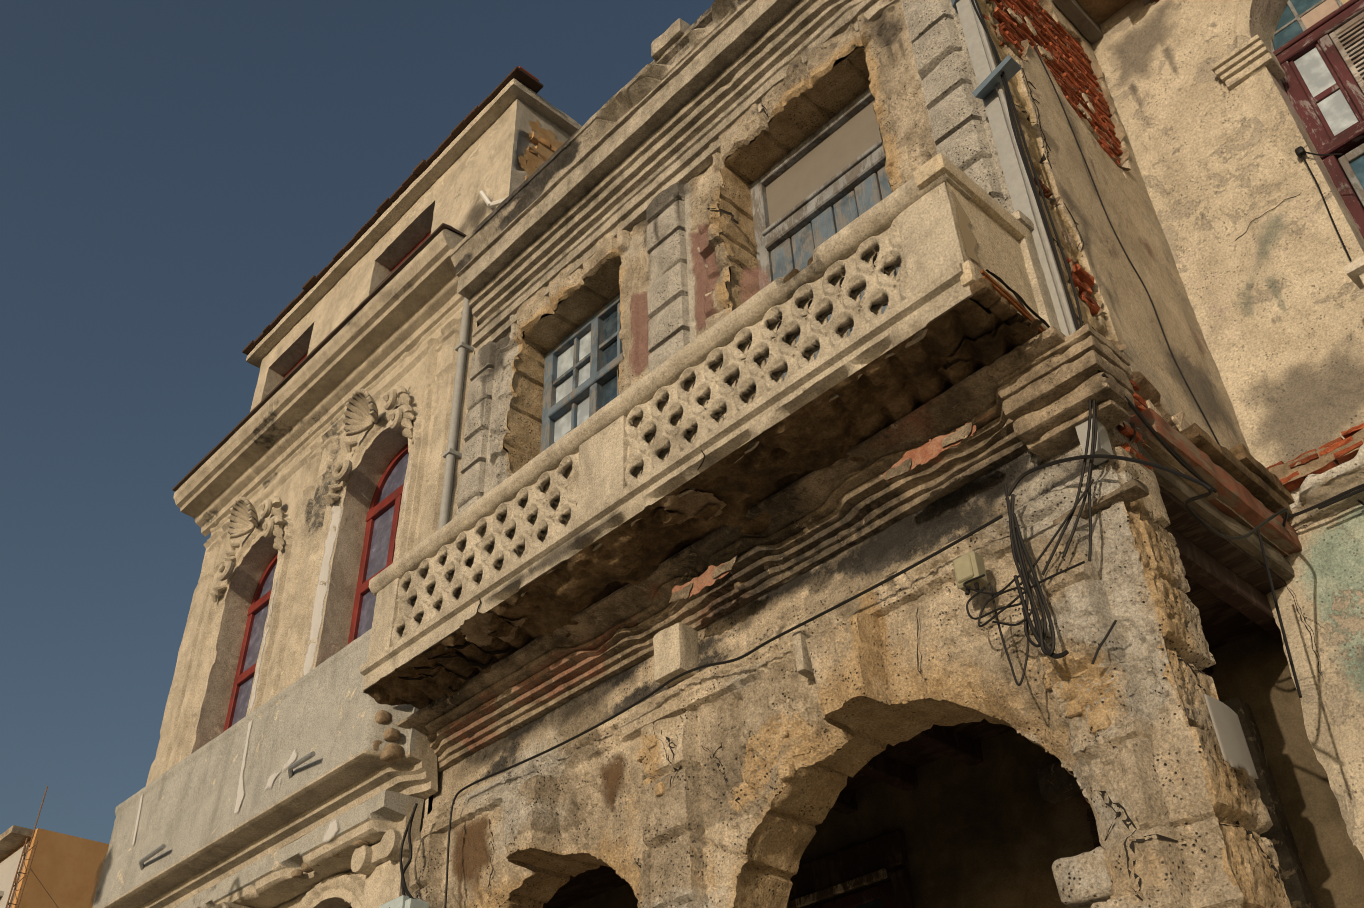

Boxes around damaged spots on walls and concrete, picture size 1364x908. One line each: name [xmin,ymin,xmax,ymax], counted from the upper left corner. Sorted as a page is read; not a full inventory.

flaking render [983,0,1131,182]
flaking render [518,120,564,180]
flaking render [1033,161,1060,208]
crack [1235,194,1300,241]
flaking render [1065,256,1104,319]
flaking render [1117,371,1185,472]
flaking render [1267,423,1364,491]
spalling [652,489,727,527]
peeling [669,556,737,603]
crack [1286,585,1325,680]
spalling [373,612,527,763]